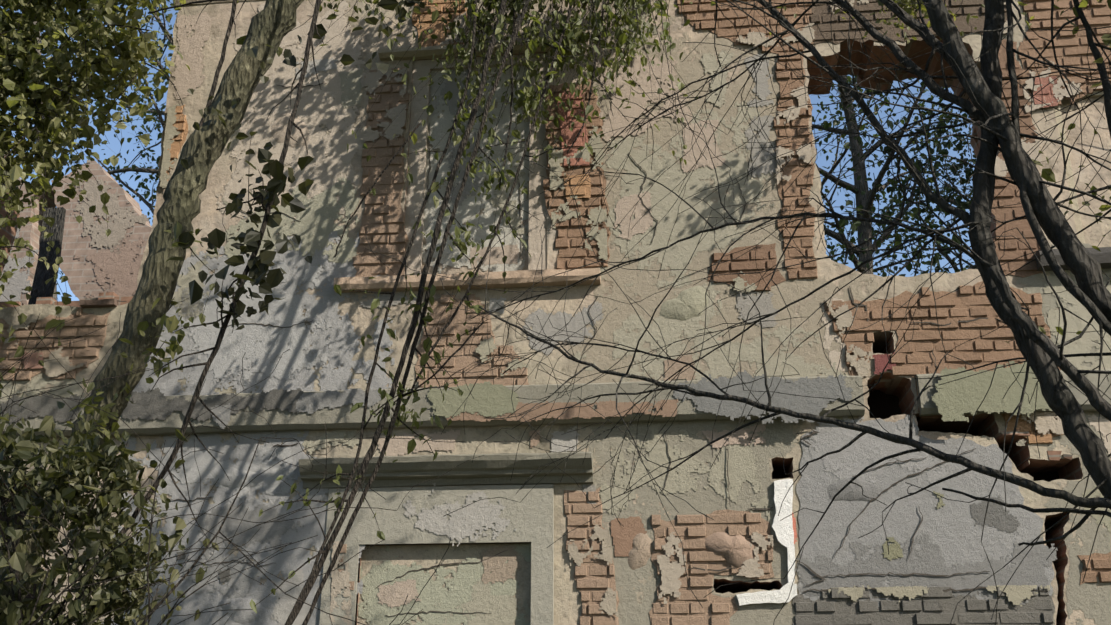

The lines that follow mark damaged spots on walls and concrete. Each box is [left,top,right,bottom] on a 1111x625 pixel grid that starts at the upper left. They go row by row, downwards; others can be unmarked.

spalling [0,160,149,381]
peeling [216,0,410,277]
spalling [415,294,529,388]
peeling [422,65,530,274]
peeling [373,399,678,456]
spalling [543,54,726,270]
spalling [677,0,938,291]
spalling [822,281,1025,436]
spalling [991,145,1111,370]
spalling [998,0,1111,144]
spalling [564,487,620,625]
spalling [649,471,1055,625]